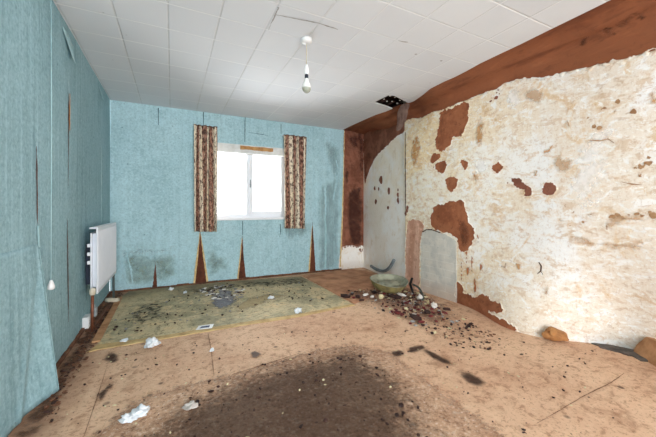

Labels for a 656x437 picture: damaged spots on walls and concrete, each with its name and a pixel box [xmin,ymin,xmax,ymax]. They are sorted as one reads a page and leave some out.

crack [269,7,338,30]
flaking render [339,0,656,290]
spalling [454,281,518,331]